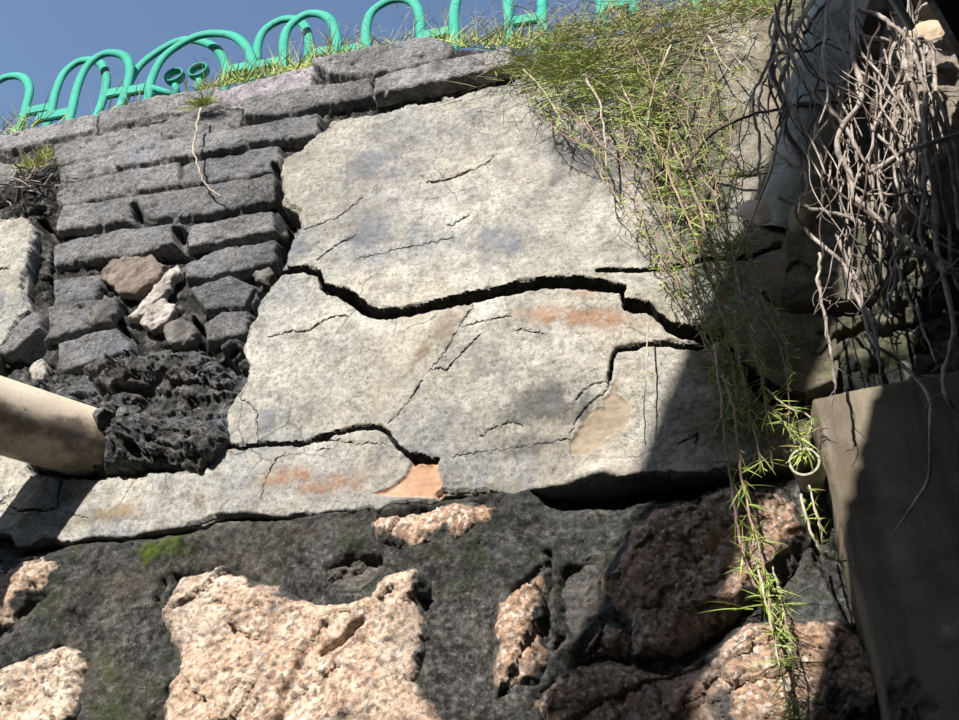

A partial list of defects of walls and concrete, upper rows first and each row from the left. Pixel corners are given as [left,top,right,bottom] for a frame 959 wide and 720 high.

spalling [253,267,278,291]
crack [761,291,872,338]
spalling [28,254,250,480]
crack [231,197,806,502]
crack [0,481,88,518]